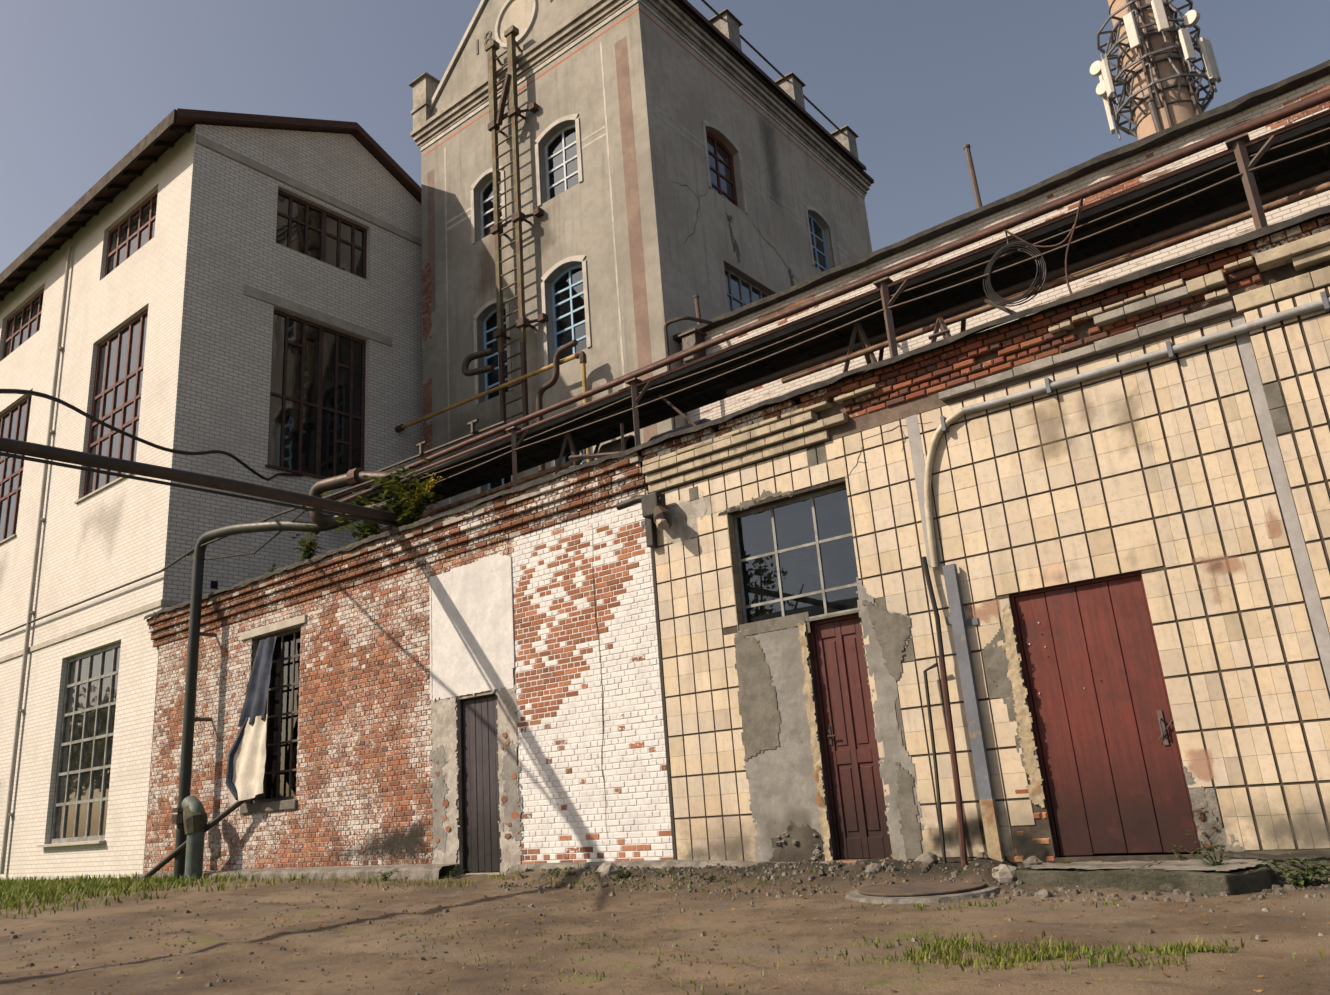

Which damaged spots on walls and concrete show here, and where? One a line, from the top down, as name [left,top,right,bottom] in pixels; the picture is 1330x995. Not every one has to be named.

peeling [1265,85,1330,130]
crack [752,223,798,286]
peeling [300,563,433,686]
peeling [143,620,276,874]
flaking render [406,696,460,872]
peeling [496,522,674,878]
spalling [769,820,825,862]